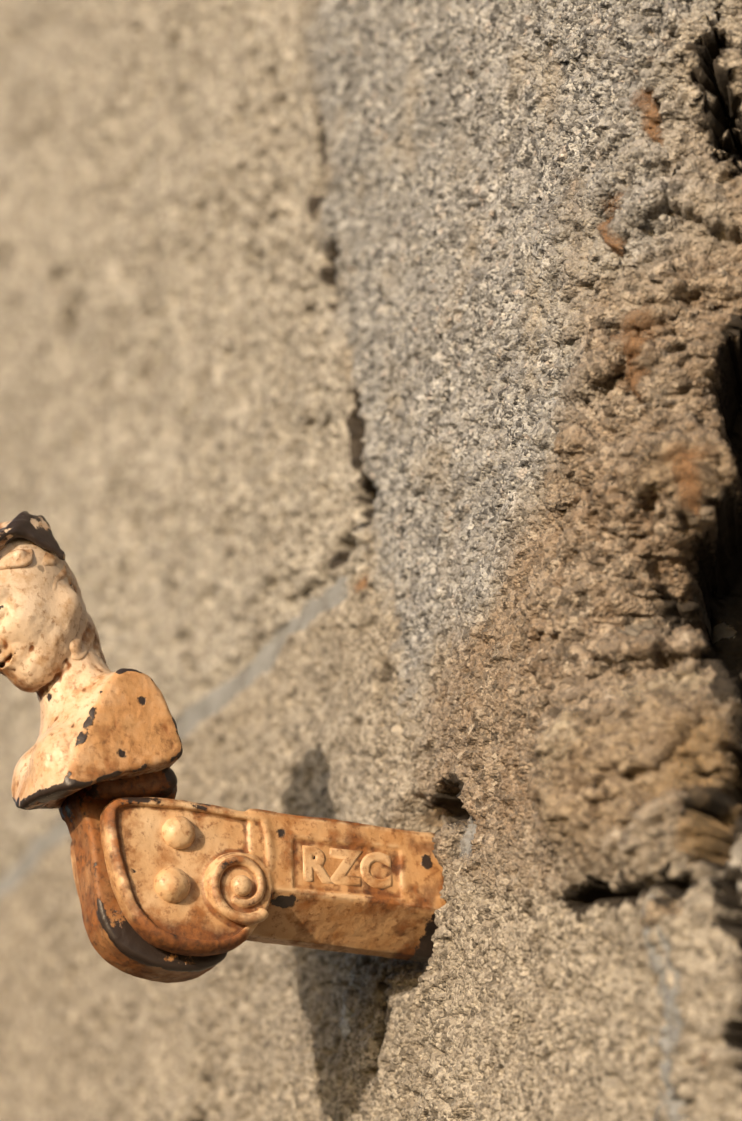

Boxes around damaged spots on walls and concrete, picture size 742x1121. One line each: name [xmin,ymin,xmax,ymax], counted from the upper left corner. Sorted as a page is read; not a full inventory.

corrosion [640,91,663,146]
corrosion [598,201,625,256]
spalling [618,592,737,645]
spalling [425,773,477,855]